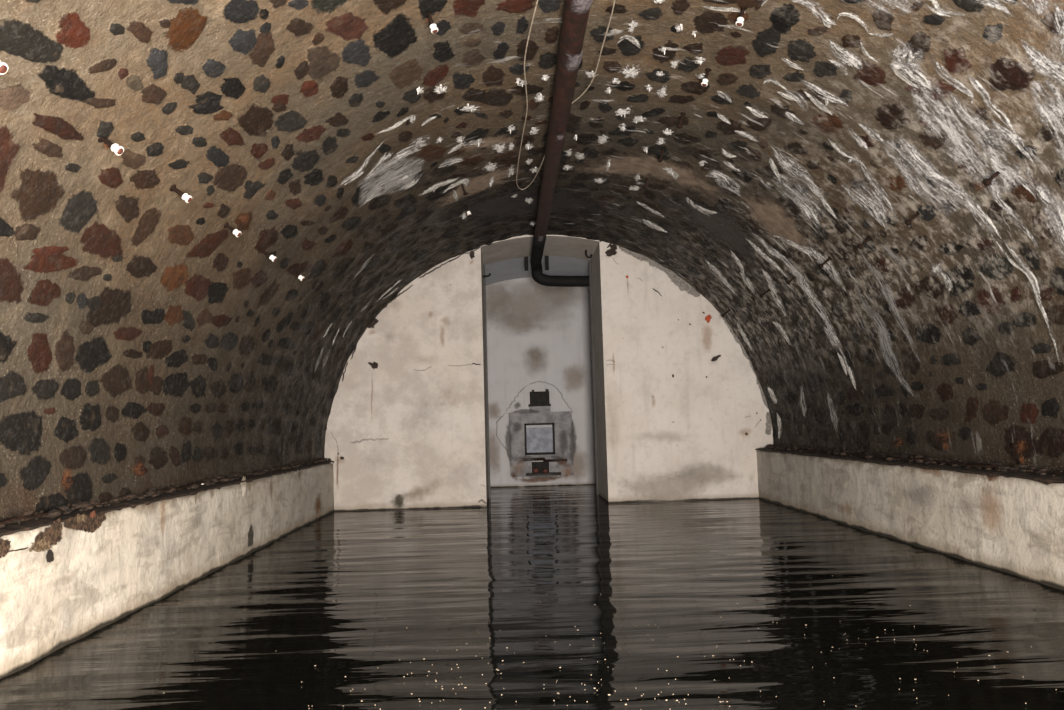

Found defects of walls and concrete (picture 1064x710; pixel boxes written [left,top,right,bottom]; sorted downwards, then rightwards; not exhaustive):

damp [416,84,447,94]
damp [336,115,597,241]
damp [614,106,647,131]
damp [605,47,677,100]
damp [699,149,740,196]
damp [769,148,836,227]
damp [763,58,848,125]
damp [792,0,893,75]
damp [891,44,1064,246]
damp [828,124,1058,356]
damp [683,198,856,389]
flaking render [0,510,106,563]